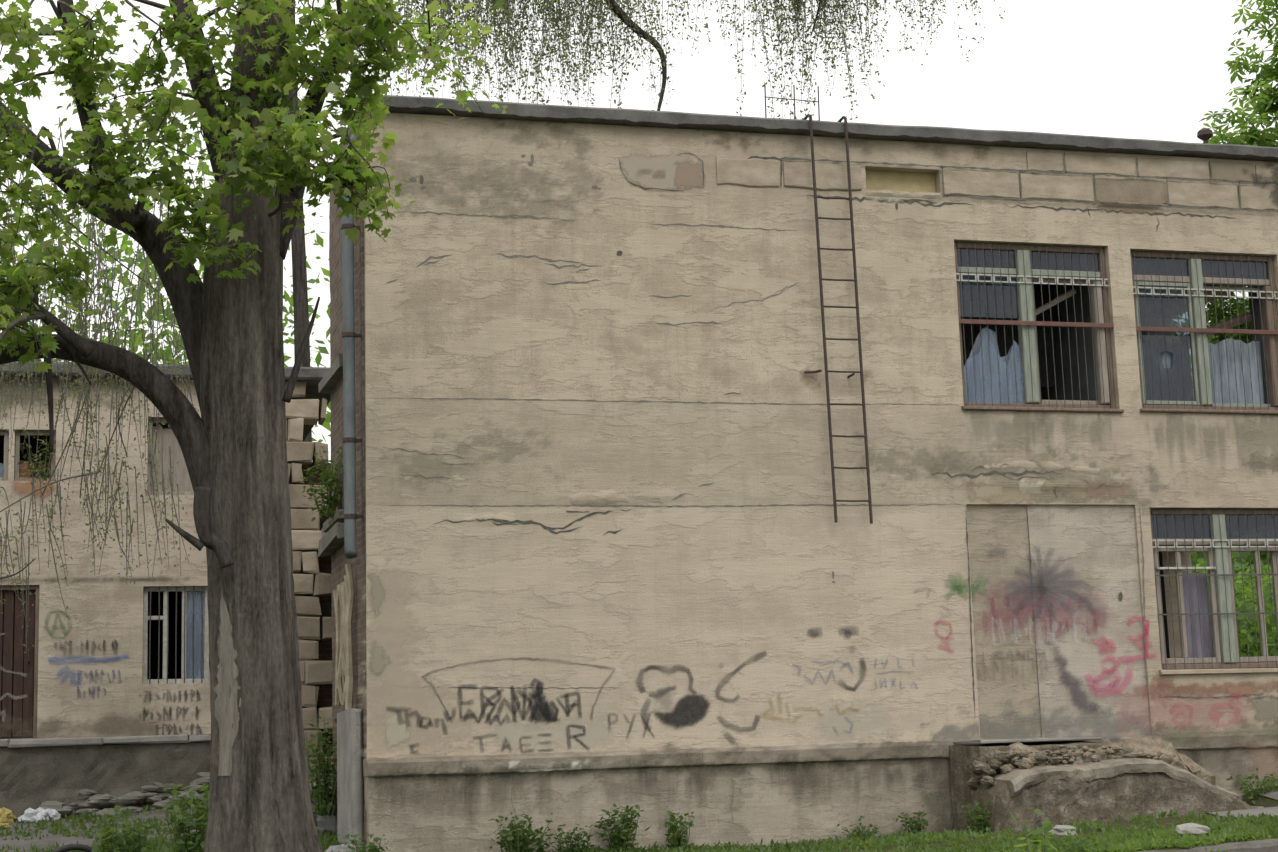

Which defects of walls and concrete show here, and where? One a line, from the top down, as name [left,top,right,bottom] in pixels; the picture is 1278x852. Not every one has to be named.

spalling [619,153,704,191]
crack [401,211,570,221]
crack [1005,204,1232,229]
crack [497,253,603,285]
crack [651,283,797,325]
crack [380,447,1061,710]
spalling [1136,682,1278,699]